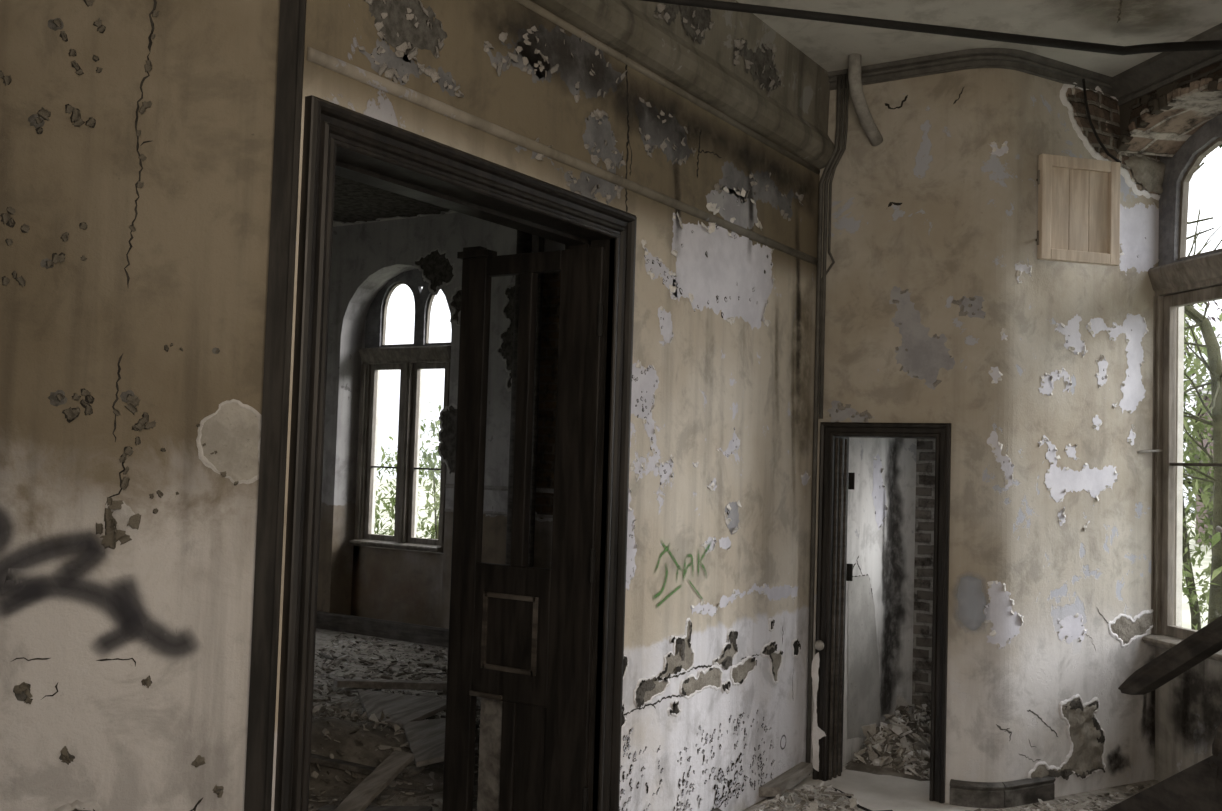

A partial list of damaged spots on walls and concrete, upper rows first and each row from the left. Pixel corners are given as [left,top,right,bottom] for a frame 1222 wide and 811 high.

peeling [358,0,464,97]
crack [124,0,159,285]
peeling [641,161,804,344]
crack [105,354,139,505]
spalling [438,403,457,478]
peeling [1038,368,1072,396]
peeling [1055,313,1149,445]
crack [623,627,783,716]
spalling [619,583,826,811]
water stain [880,438,905,715]
peeling [984,581,1024,649]
spalling [1028,694,1106,780]